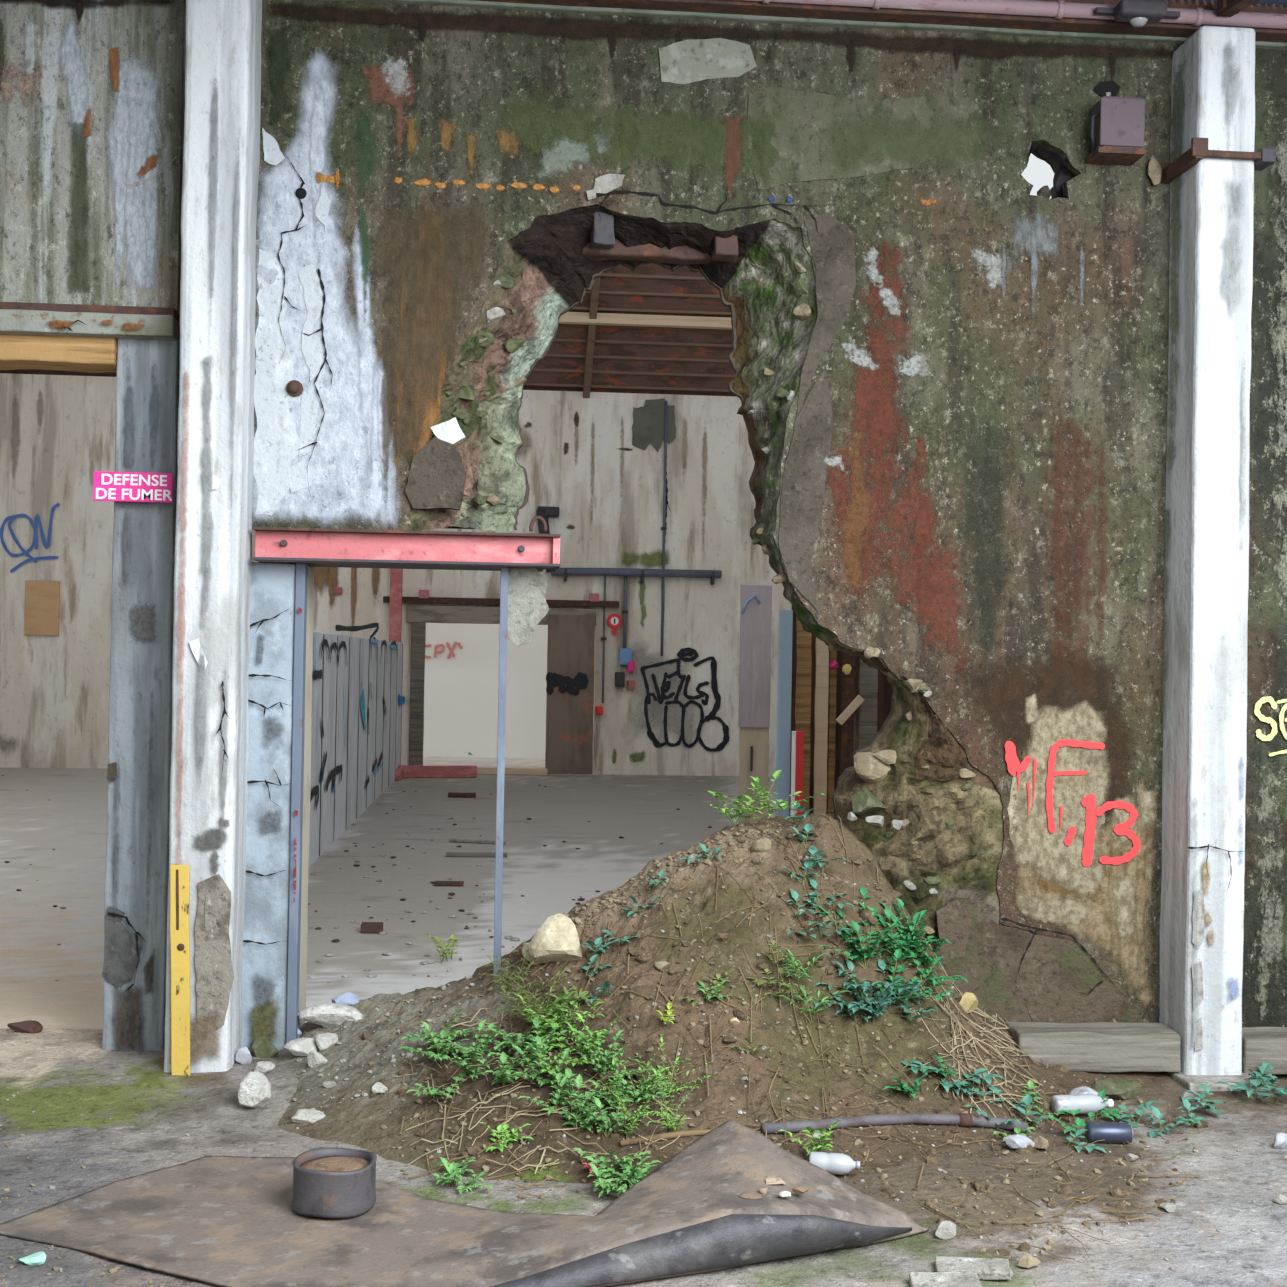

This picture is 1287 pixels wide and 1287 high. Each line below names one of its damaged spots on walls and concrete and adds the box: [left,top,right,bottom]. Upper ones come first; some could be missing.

damp [0,0,173,292]
corrosion [48,320,74,328]
corrosion [101,320,145,330]
crack [277,154,333,496]
corrosion [396,343,446,479]
crack [250,608,290,633]
spalling [405,174,1142,1023]
crack [215,674,291,809]
crack [1188,844,1250,898]
spalling [102,906,143,987]
spalling [195,874,234,1029]
crack [243,938,280,946]